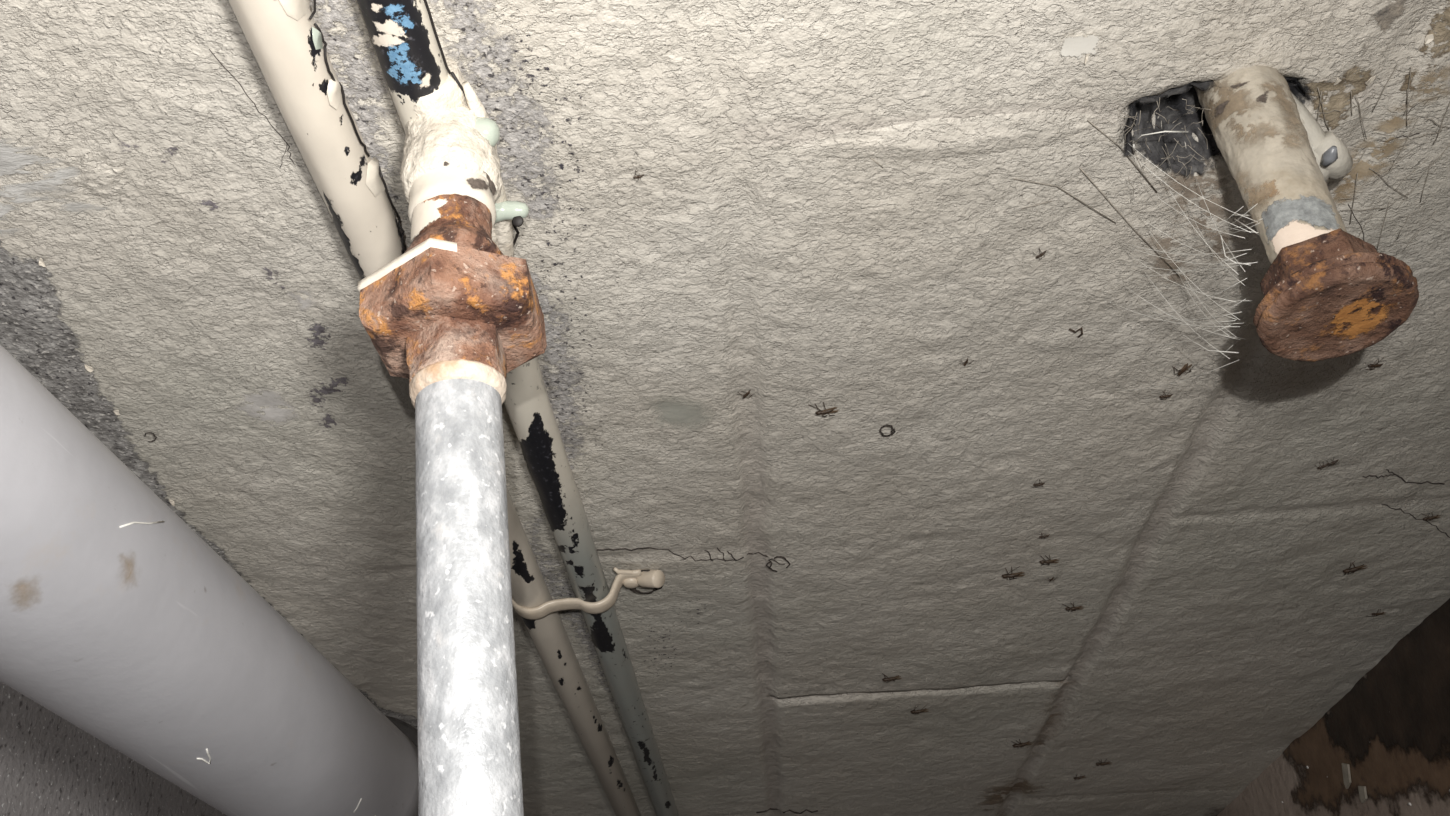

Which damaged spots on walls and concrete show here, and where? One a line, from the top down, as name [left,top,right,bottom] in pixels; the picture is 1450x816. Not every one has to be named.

peeling [1375,0,1406,32]
peeling [1400,0,1450,91]
spalling [1124,80,1247,178]
peeling [1284,66,1375,130]